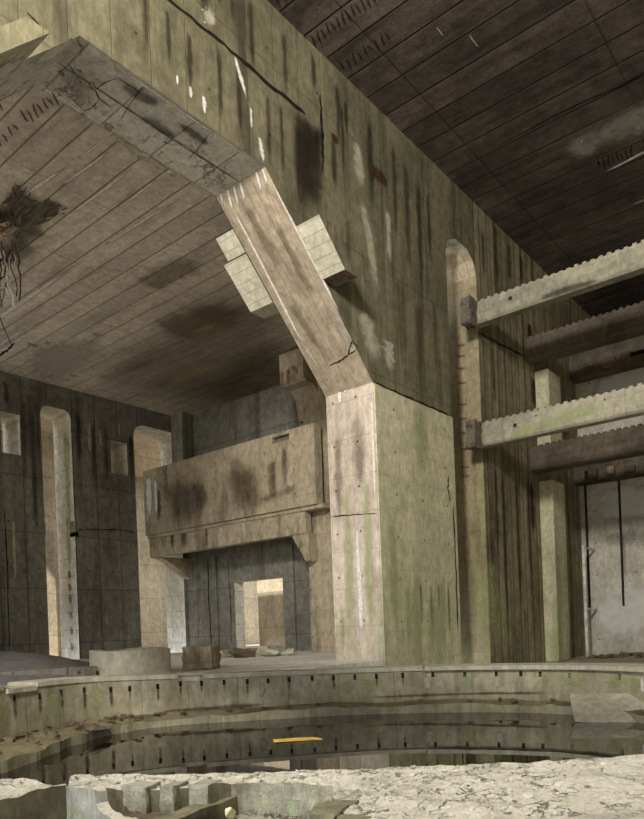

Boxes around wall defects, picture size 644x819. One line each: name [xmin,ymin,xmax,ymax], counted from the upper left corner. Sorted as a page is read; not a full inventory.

crack [66,63,236,180]
water stain [235,58,252,127]
crack [168,0,324,173]
water stain [255,137,269,189]
water stain [220,182,301,339]
water stain [275,189,335,304]